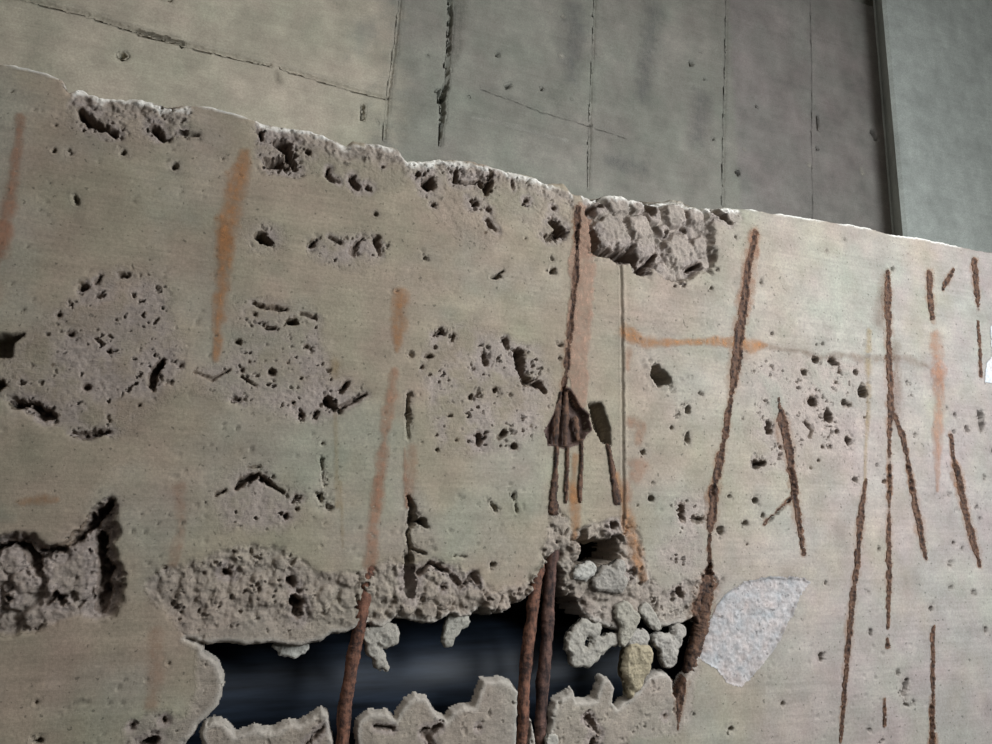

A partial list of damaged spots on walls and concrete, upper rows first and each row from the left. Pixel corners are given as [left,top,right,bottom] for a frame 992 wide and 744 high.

spalling [62,83,195,150]
spalling [0,497,118,614]
spalling [121,498,811,744]
corrosion [516,541,560,744]
corrosion [548,205,584,537]
corrosion [622,229,764,730]
spalling [705,208,745,229]
corrosion [839,478,868,743]
corrosion [884,270,928,649]
corrosion [926,268,955,320]
corrosion [935,432,982,568]
corrosion [971,257,983,377]